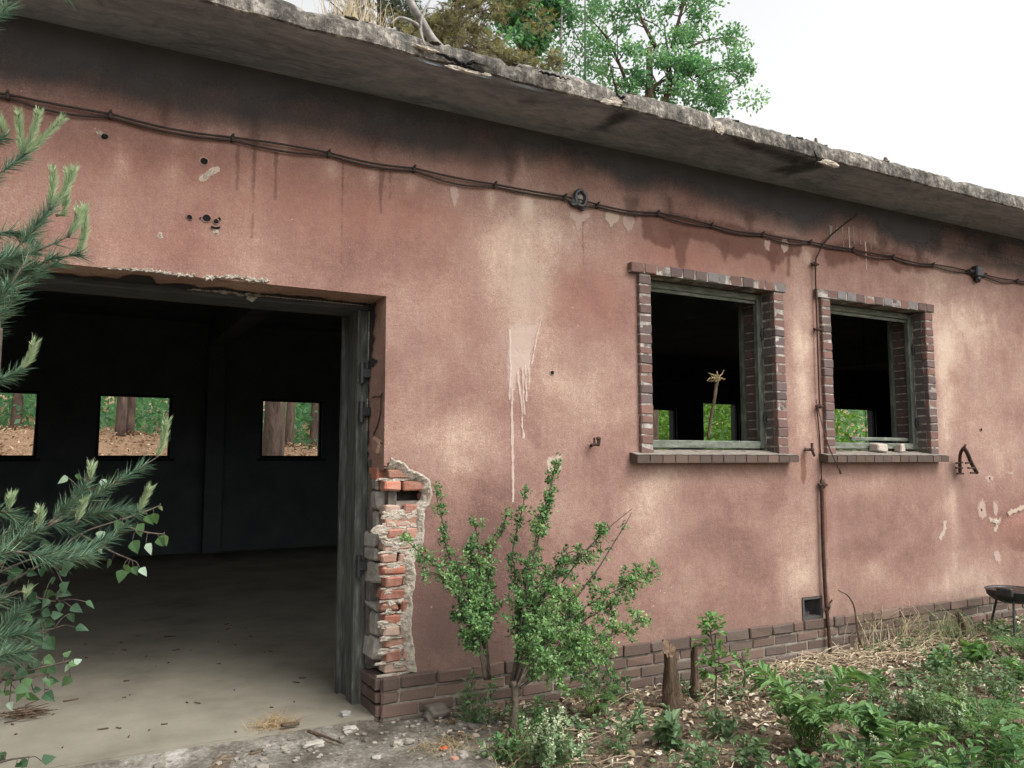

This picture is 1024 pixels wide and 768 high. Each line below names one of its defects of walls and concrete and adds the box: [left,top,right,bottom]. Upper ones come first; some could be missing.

water stain [0,15,1024,275]
flaking render [101,266,279,302]
water stain [509,322,541,502]
flaking render [363,436,432,678]
peeling [978,501,1024,532]